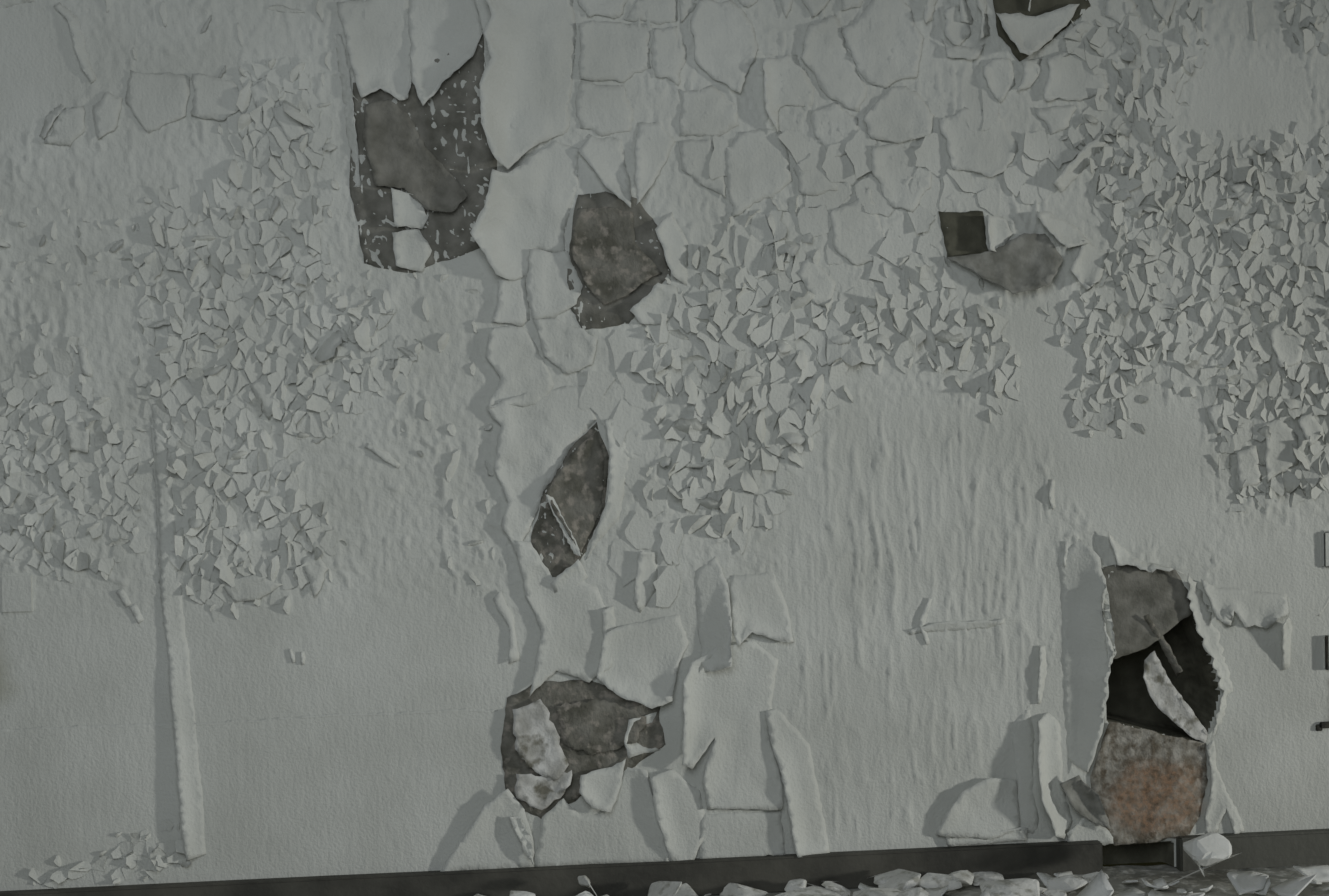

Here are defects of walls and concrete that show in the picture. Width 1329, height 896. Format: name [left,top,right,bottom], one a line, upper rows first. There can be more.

peeling [0,57,424,889]
peeling [334,0,1329,872]
crack [575,0,1175,310]